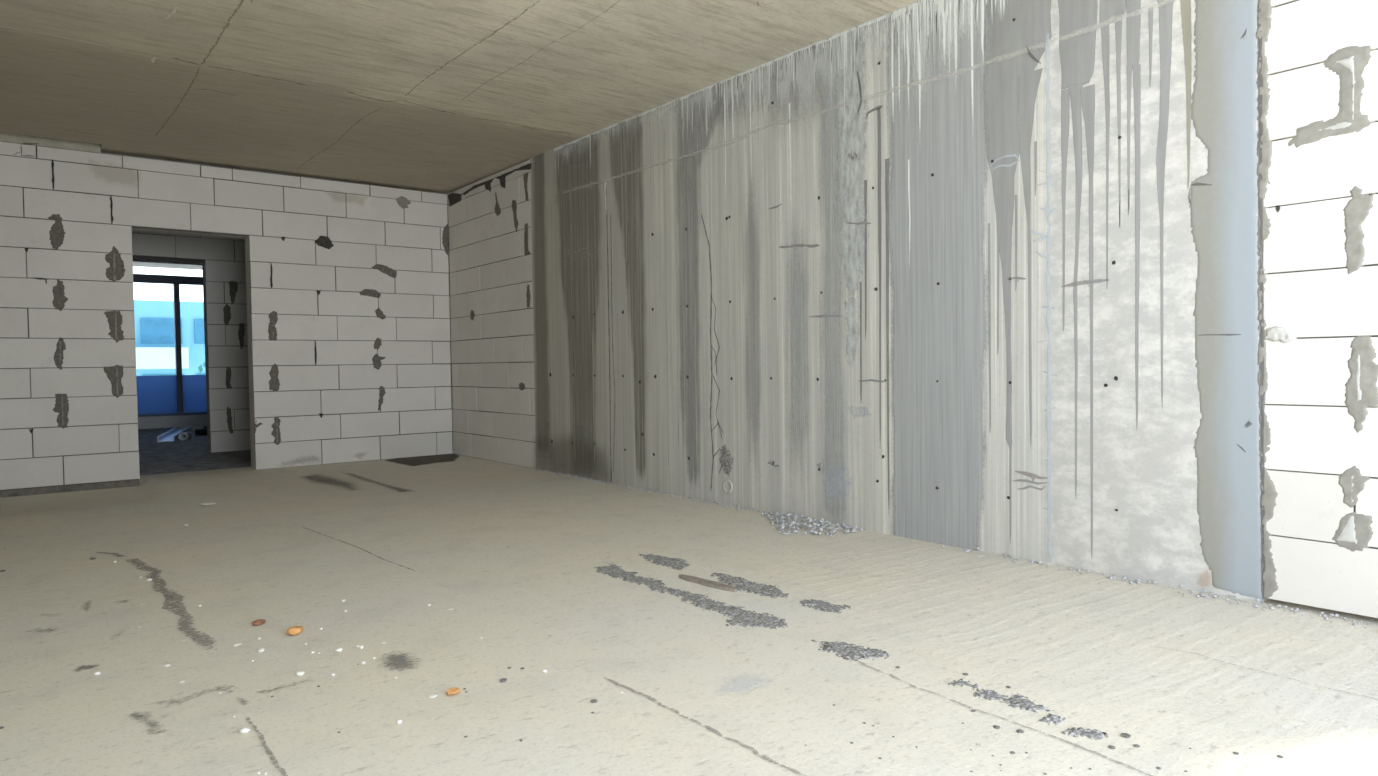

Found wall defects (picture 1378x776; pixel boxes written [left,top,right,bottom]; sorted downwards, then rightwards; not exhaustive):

crack [701,214,724,489]
leakage [547,0,1191,554]